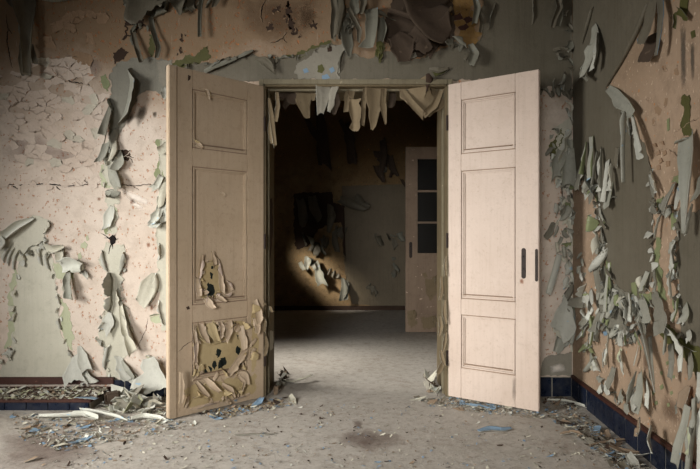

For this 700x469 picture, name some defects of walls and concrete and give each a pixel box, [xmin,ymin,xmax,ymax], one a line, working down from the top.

crack [45,61,90,88]
peeling [0,0,220,395]
peeling [181,0,700,437]
peeling [552,396,653,469]
peeling [667,350,700,469]